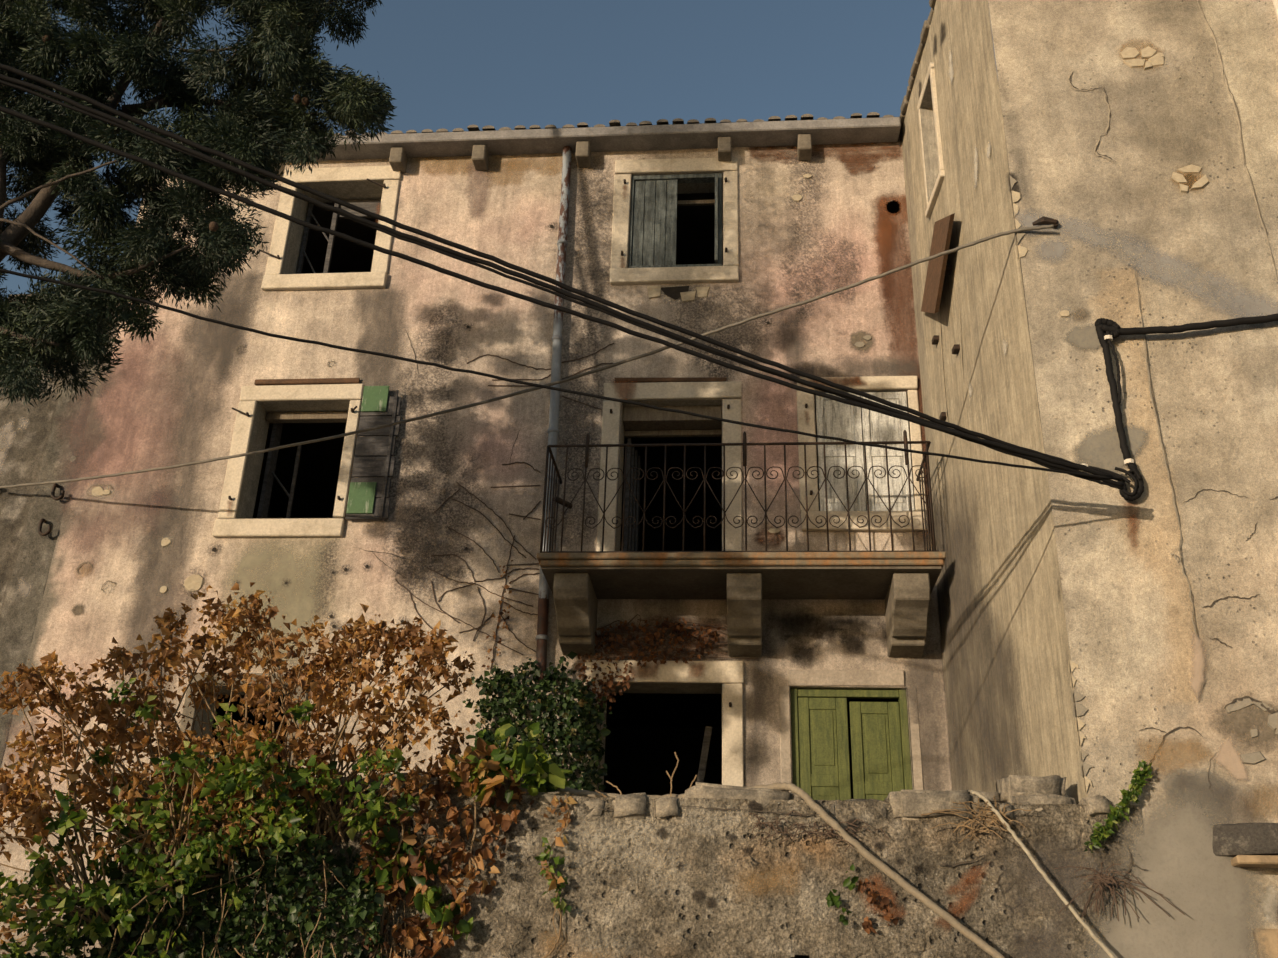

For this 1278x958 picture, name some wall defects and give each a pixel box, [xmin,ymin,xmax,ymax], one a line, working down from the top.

spalling [1119,44,1165,70]
crack [1067,71,1114,163]
spalling [1171,164,1210,193]
spalling [647,286,710,303]
rust [875,195,930,537]
crack [1135,268,1278,791]
spalling [1214,696,1278,780]